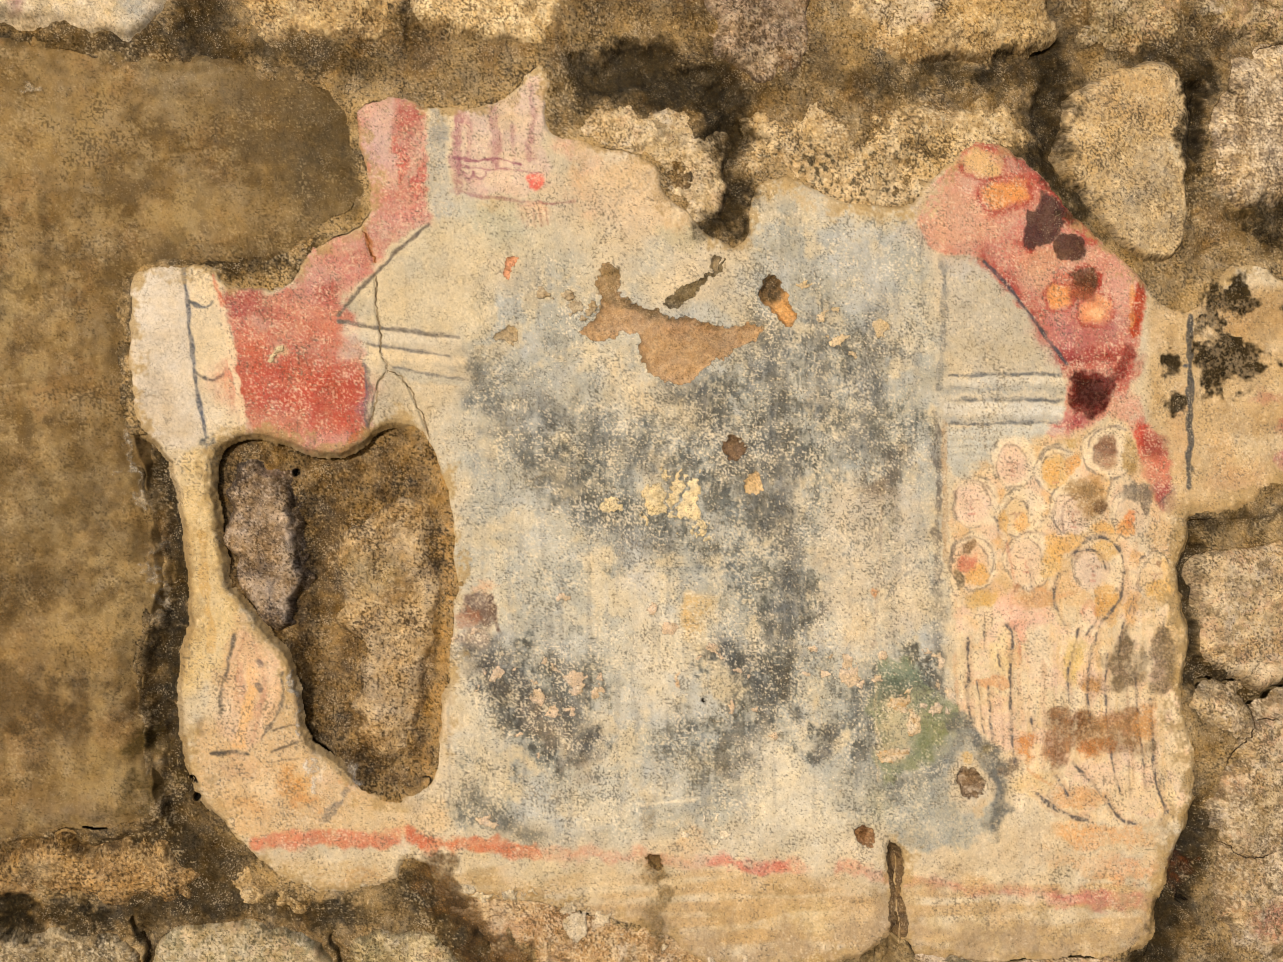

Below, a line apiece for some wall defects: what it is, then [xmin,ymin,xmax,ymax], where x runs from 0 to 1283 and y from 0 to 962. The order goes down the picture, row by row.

water stain [583,41,758,237]
flaking render [536,255,764,385]
flaking render [758,274,812,327]
peeling [816,307,857,359]
water stain [1192,273,1283,398]
flaking render [219,426,482,803]
peeling [475,666,516,692]
peeling [529,657,605,718]
peeling [475,814,500,829]
water stain [412,853,532,962]